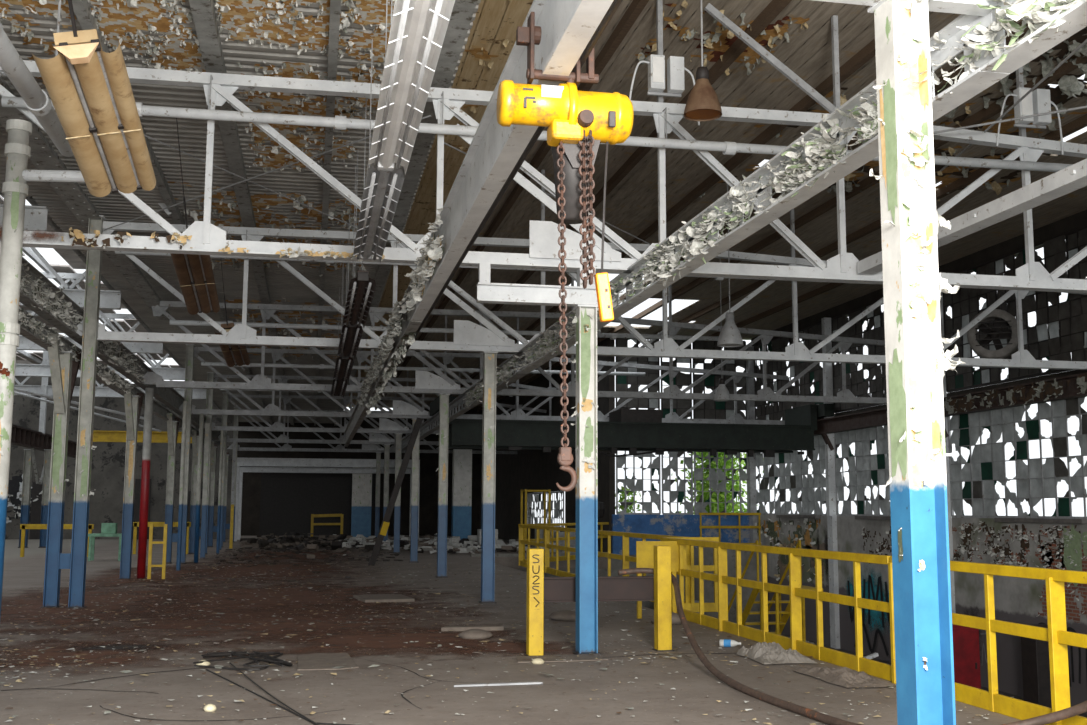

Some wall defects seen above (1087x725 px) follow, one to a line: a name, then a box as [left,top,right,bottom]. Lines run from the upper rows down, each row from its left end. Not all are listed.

peeling [0,0,77,61]
peeling [90,0,206,72]
peeling [465,39,509,69]
peeling [239,90,379,173]
peeling [609,0,1087,323]
peeling [463,308,600,482]
peeling [885,348,941,488]
peeling [941,330,965,377]
peeling [943,373,1087,414]
peeling [950,521,1087,623]